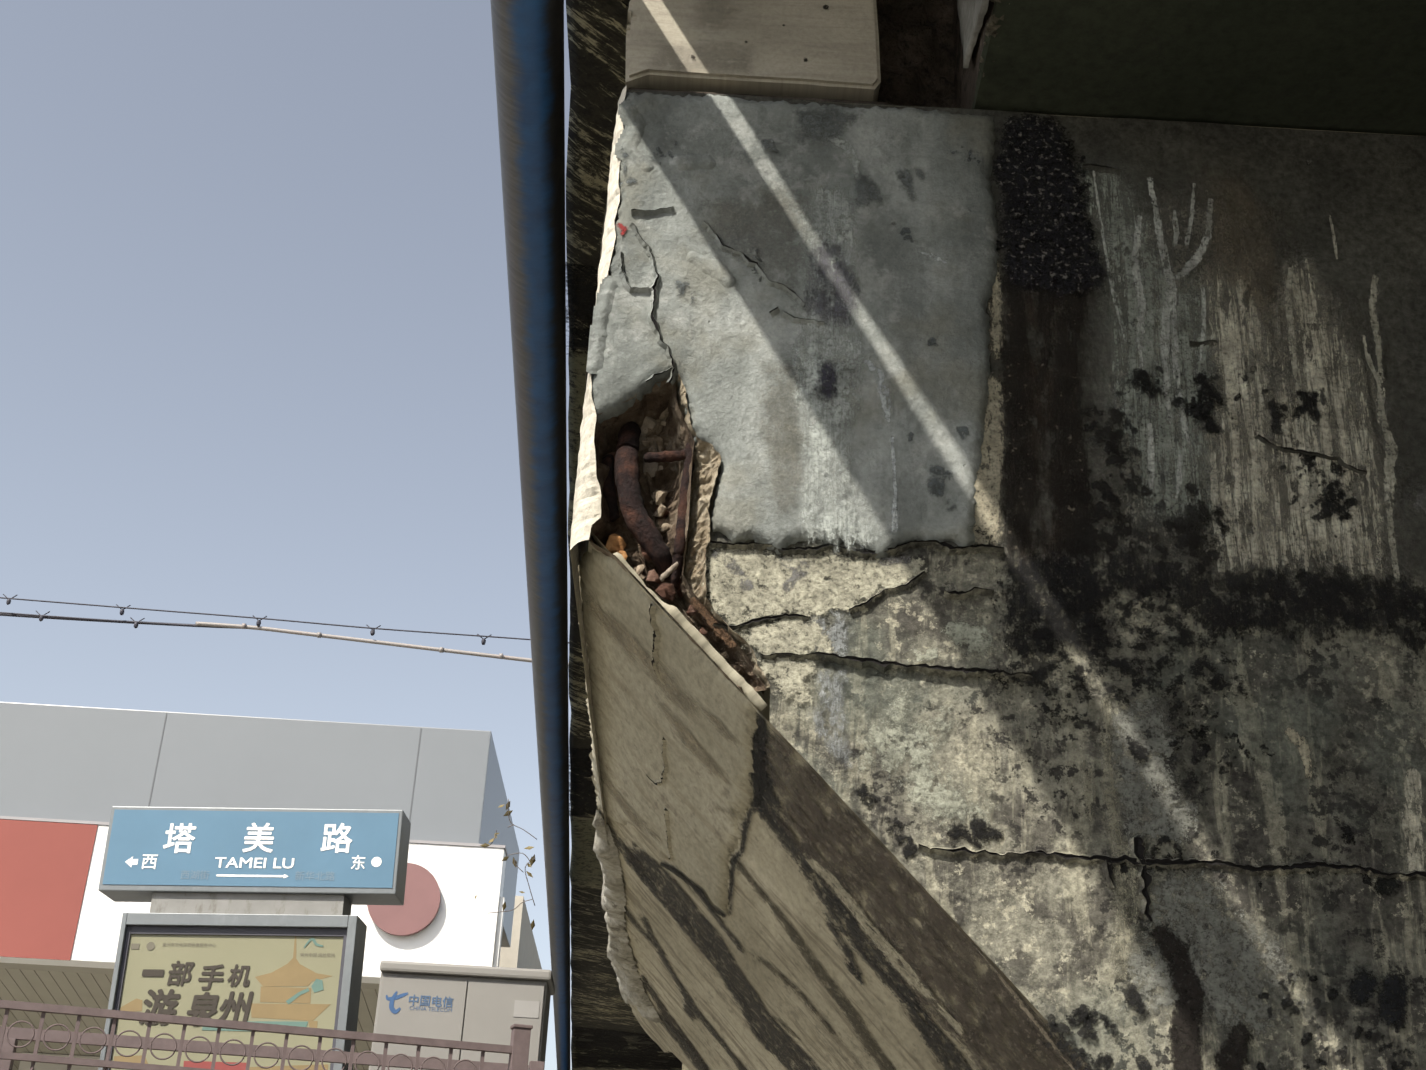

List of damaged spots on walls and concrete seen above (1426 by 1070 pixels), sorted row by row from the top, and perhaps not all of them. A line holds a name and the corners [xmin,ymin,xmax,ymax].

flaking render [957,0,1010,77]
crack [618,206,825,386]
crack [709,540,1004,615]
water stain [945,110,1426,1070]
crack [649,603,666,685]
flaking render [578,374,770,915]
crack [713,613,1033,682]
crack [646,737,674,861]
crack [918,837,1426,922]